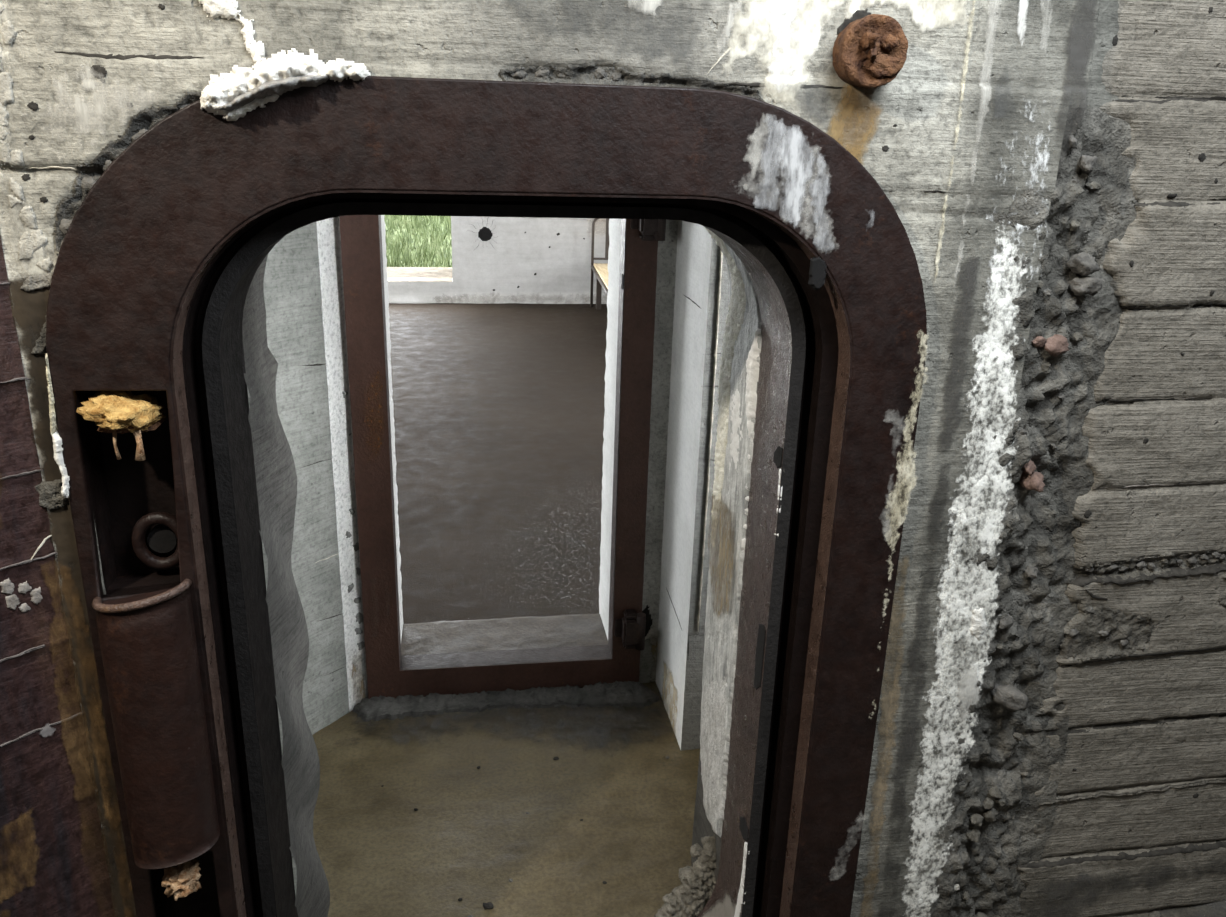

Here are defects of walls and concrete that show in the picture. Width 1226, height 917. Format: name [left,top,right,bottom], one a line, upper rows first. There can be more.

flaking render [0,0,201,291]
leakage [199,0,371,121]
corrosion [830,84,880,163]
corrosion [859,30,902,78]
leakage [1018,0,1027,39]
leakage [700,227,762,837]
leakage [883,335,929,616]
leakage [892,213,1040,917]
spalling [930,106,1221,917]
spalling [654,825,717,917]